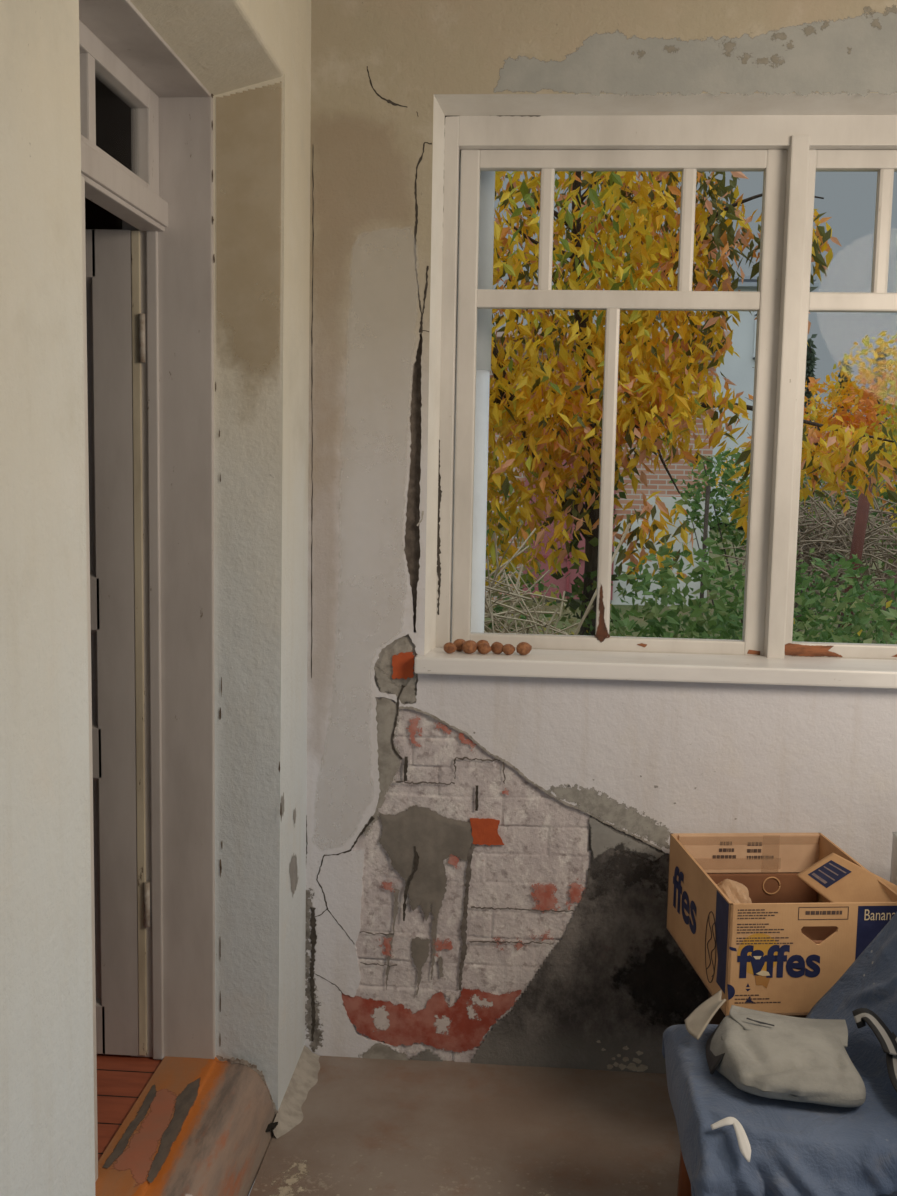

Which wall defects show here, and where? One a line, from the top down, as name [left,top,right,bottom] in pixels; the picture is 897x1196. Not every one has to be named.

crack [367,66,432,632]
crack [314,816,375,944]
flaking render [342,634,662,1062]
water stain [589,843,668,899]
water stain [612,936,709,1027]